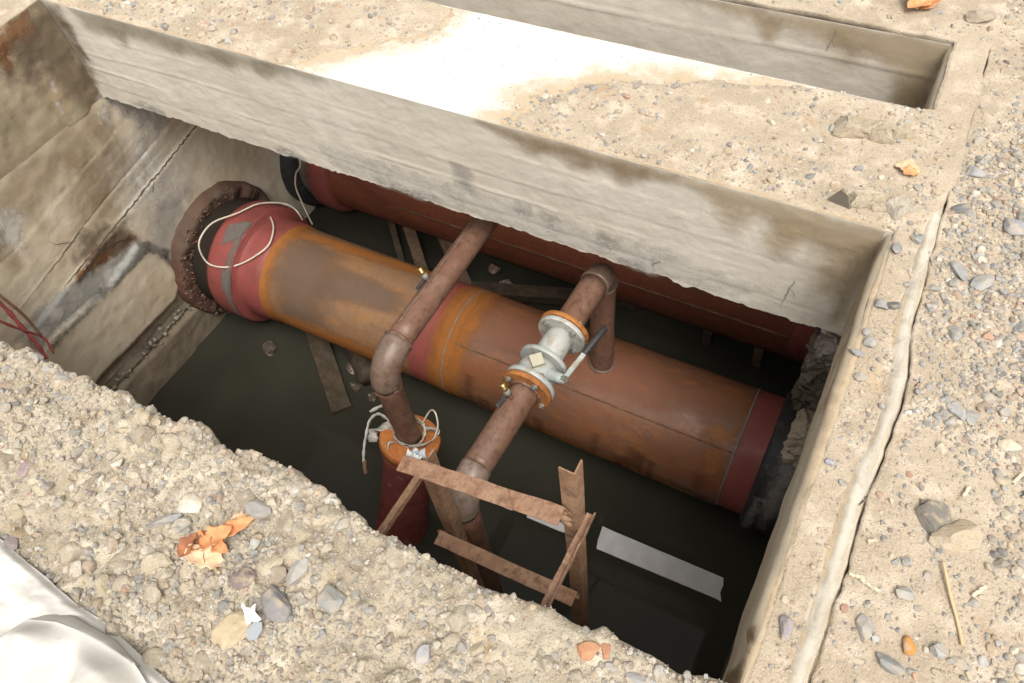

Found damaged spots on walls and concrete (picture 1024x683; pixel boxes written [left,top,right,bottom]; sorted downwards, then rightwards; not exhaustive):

corrosion [0,11,36,71]
damp [499,129,671,178]
corrosion [75,233,135,284]
damp [275,242,397,321]
damp [321,148,732,291]
damp [698,187,883,355]
spalling [791,327,841,413]